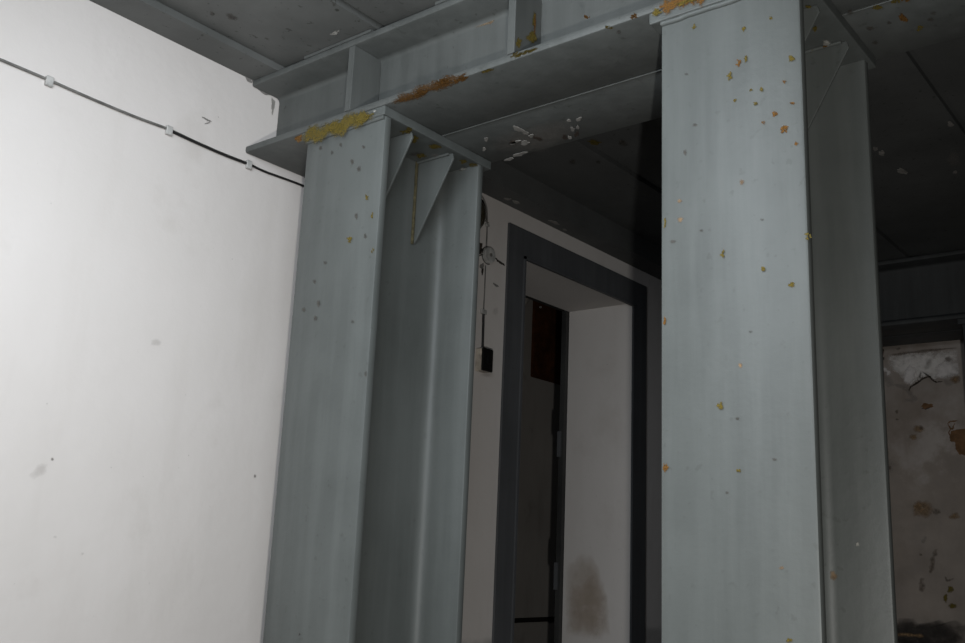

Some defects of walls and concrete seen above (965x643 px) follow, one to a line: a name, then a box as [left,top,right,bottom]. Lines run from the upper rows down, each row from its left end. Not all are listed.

rust [652,0,704,16]
rust [394,73,468,104]
rust [295,110,376,149]
peeling [883,349,958,391]
water stain [897,622,956,643]